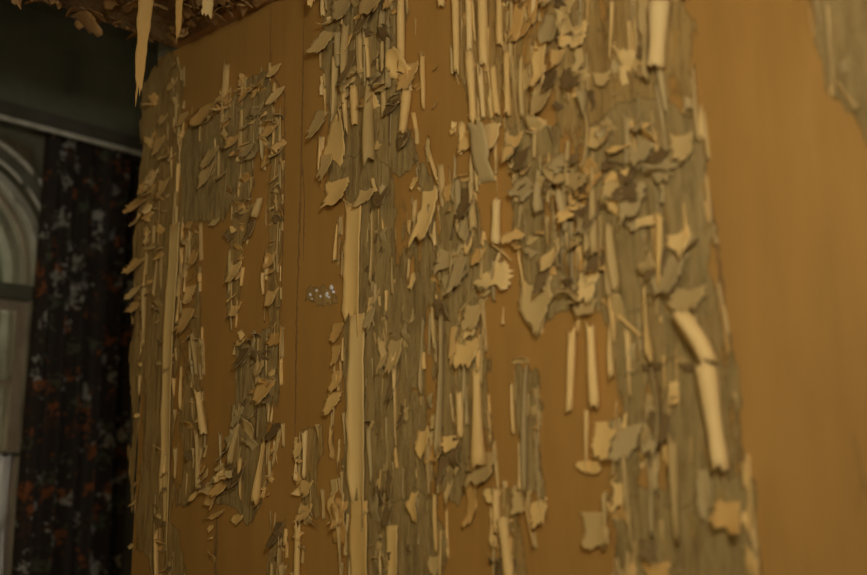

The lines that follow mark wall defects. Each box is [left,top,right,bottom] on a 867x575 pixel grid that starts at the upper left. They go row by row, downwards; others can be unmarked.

peeling [11,0,287,575]
peeling [265,0,759,575]
peeling [808,0,867,142]